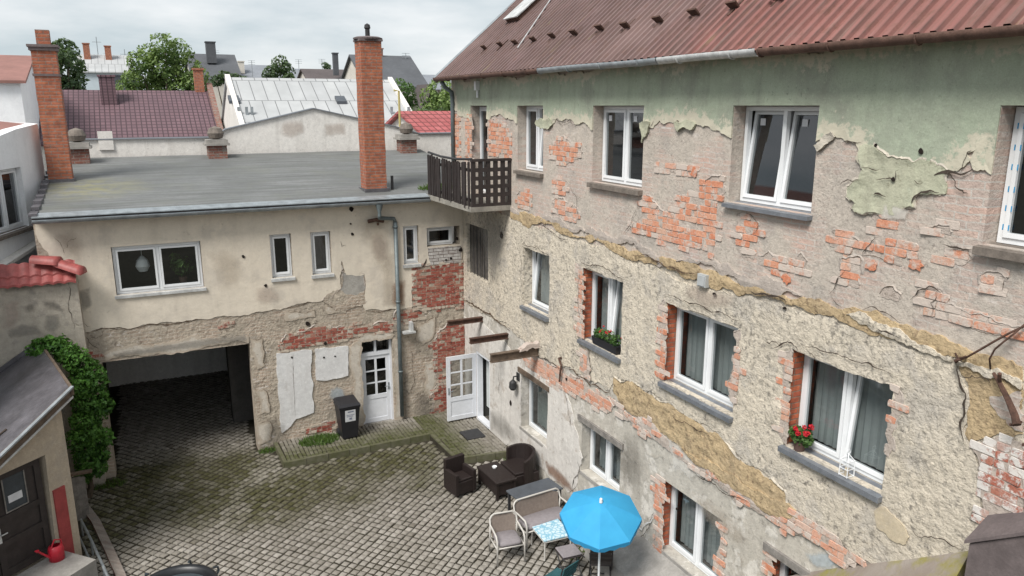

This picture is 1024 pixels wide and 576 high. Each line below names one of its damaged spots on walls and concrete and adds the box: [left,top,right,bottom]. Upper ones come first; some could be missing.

flaking render [455,112,512,164]
flaking render [535,118,583,223]
peeling [639,121,650,143]
peeling [813,132,836,152]
crack [934,151,972,194]
flaking render [627,162,812,285]
peeling [825,142,1024,341]
flaking render [278,237,465,414]
crack [767,341,898,378]
flaking render [301,420,338,434]
flaking render [523,263,867,576]
flaking render [969,432,1024,524]